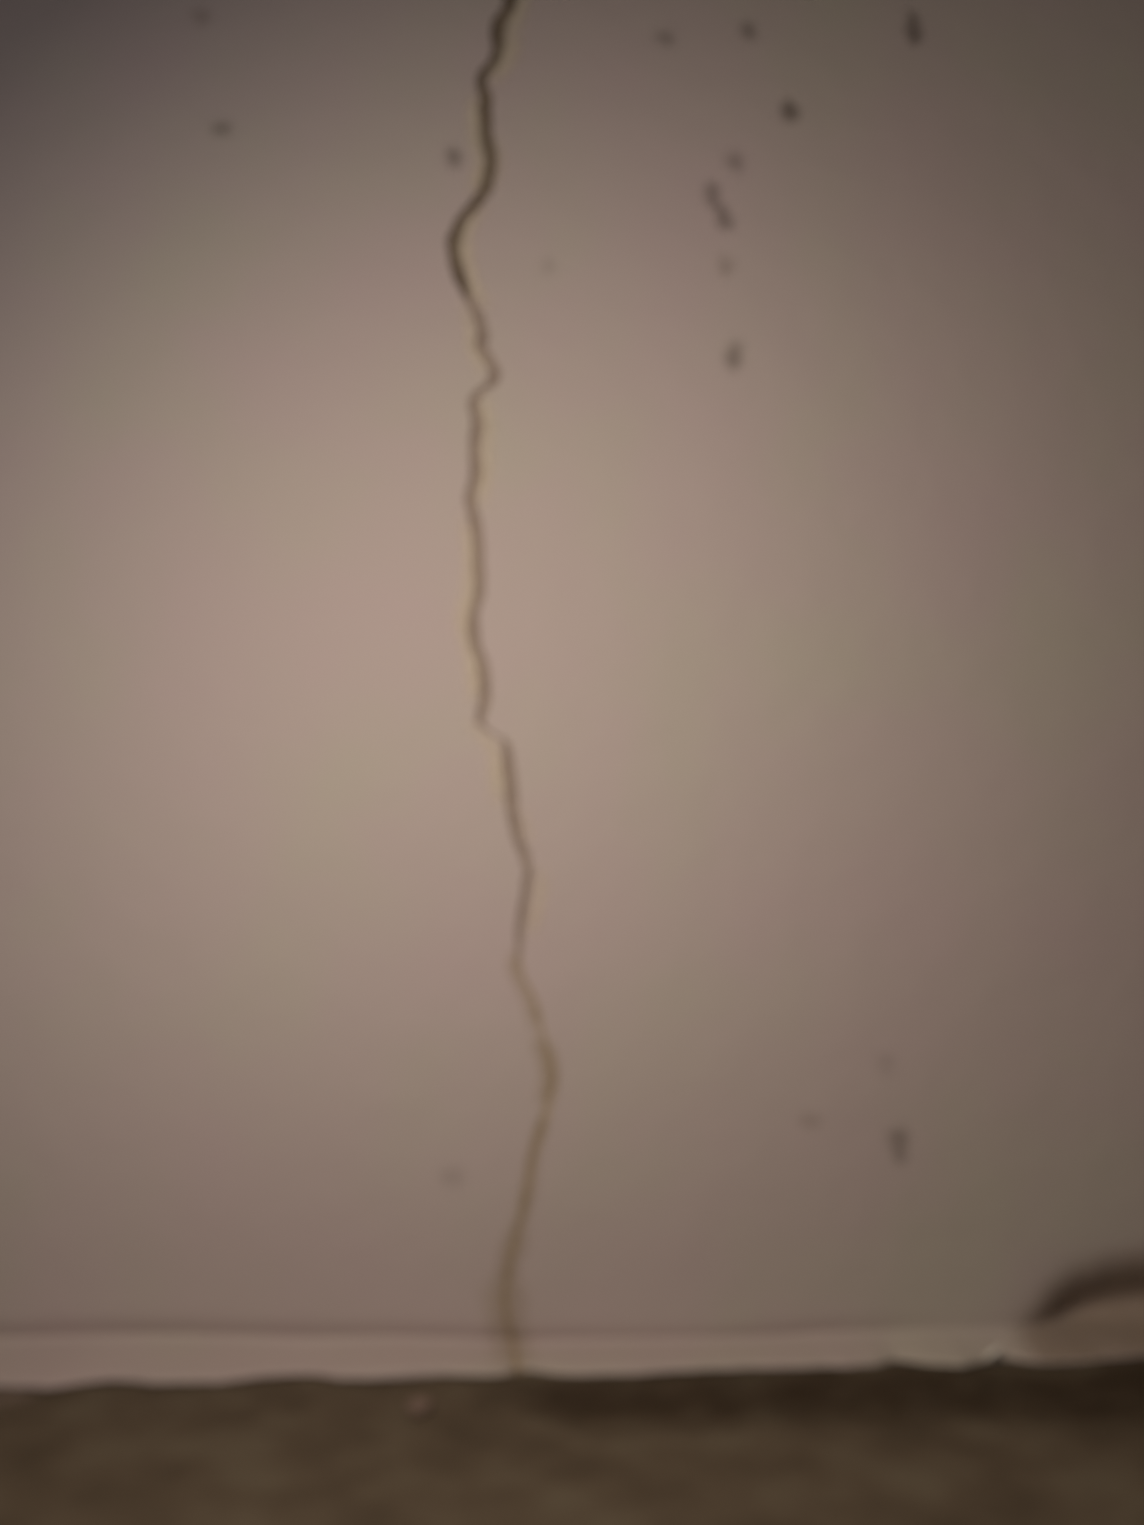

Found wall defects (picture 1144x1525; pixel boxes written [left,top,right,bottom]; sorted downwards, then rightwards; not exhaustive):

crack [446,0,557,1375]